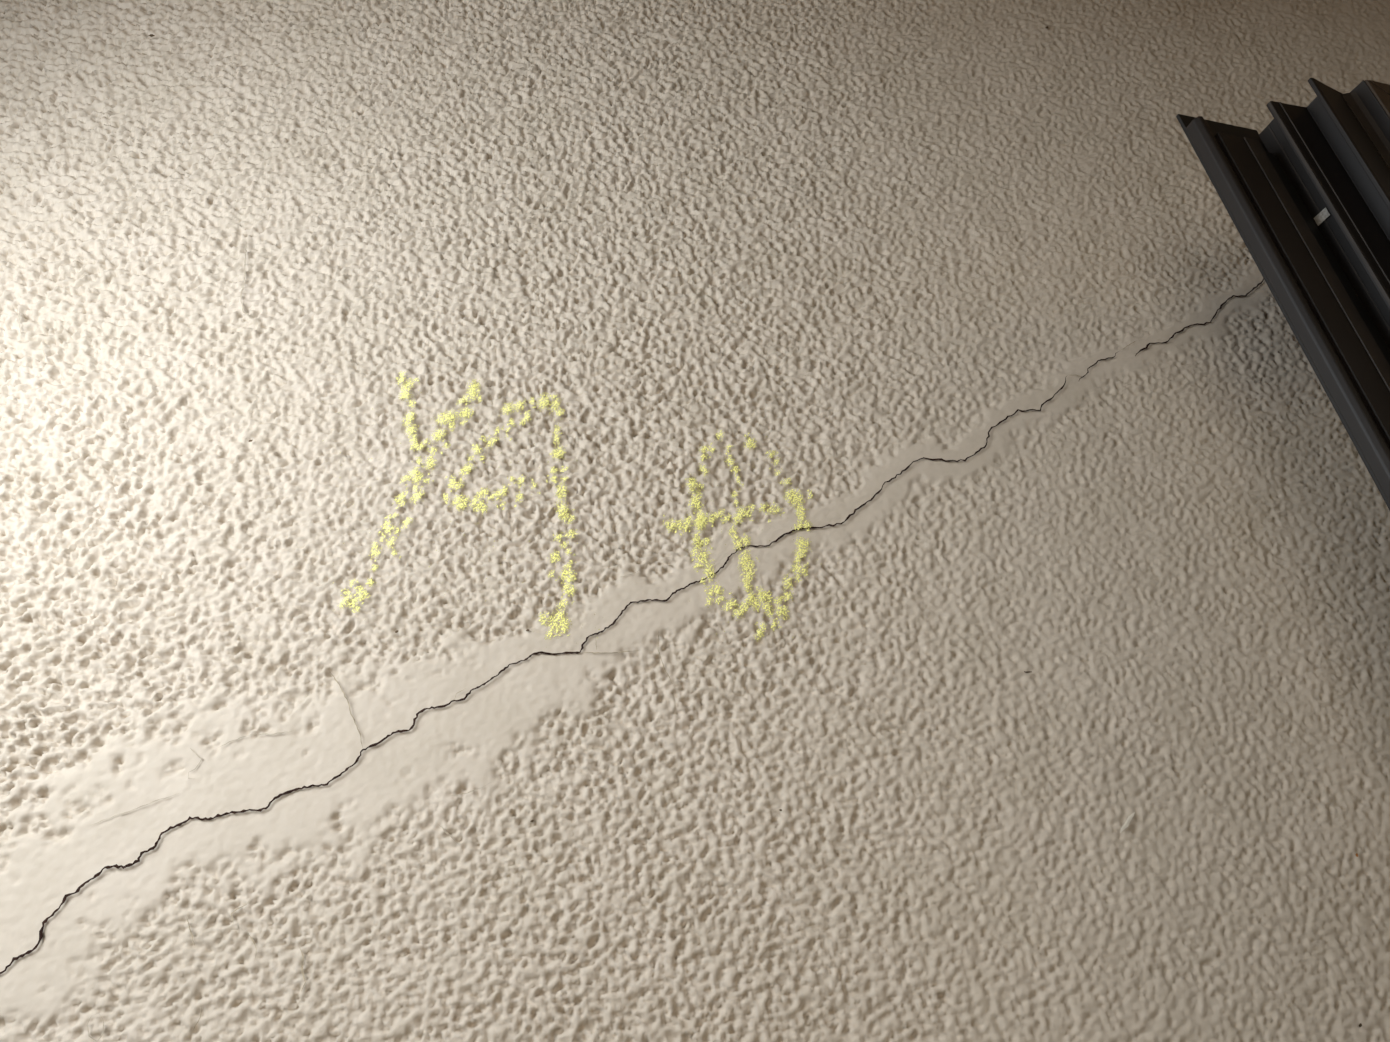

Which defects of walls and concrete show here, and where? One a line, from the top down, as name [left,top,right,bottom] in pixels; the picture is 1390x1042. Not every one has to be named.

crack [0,278,1264,974]